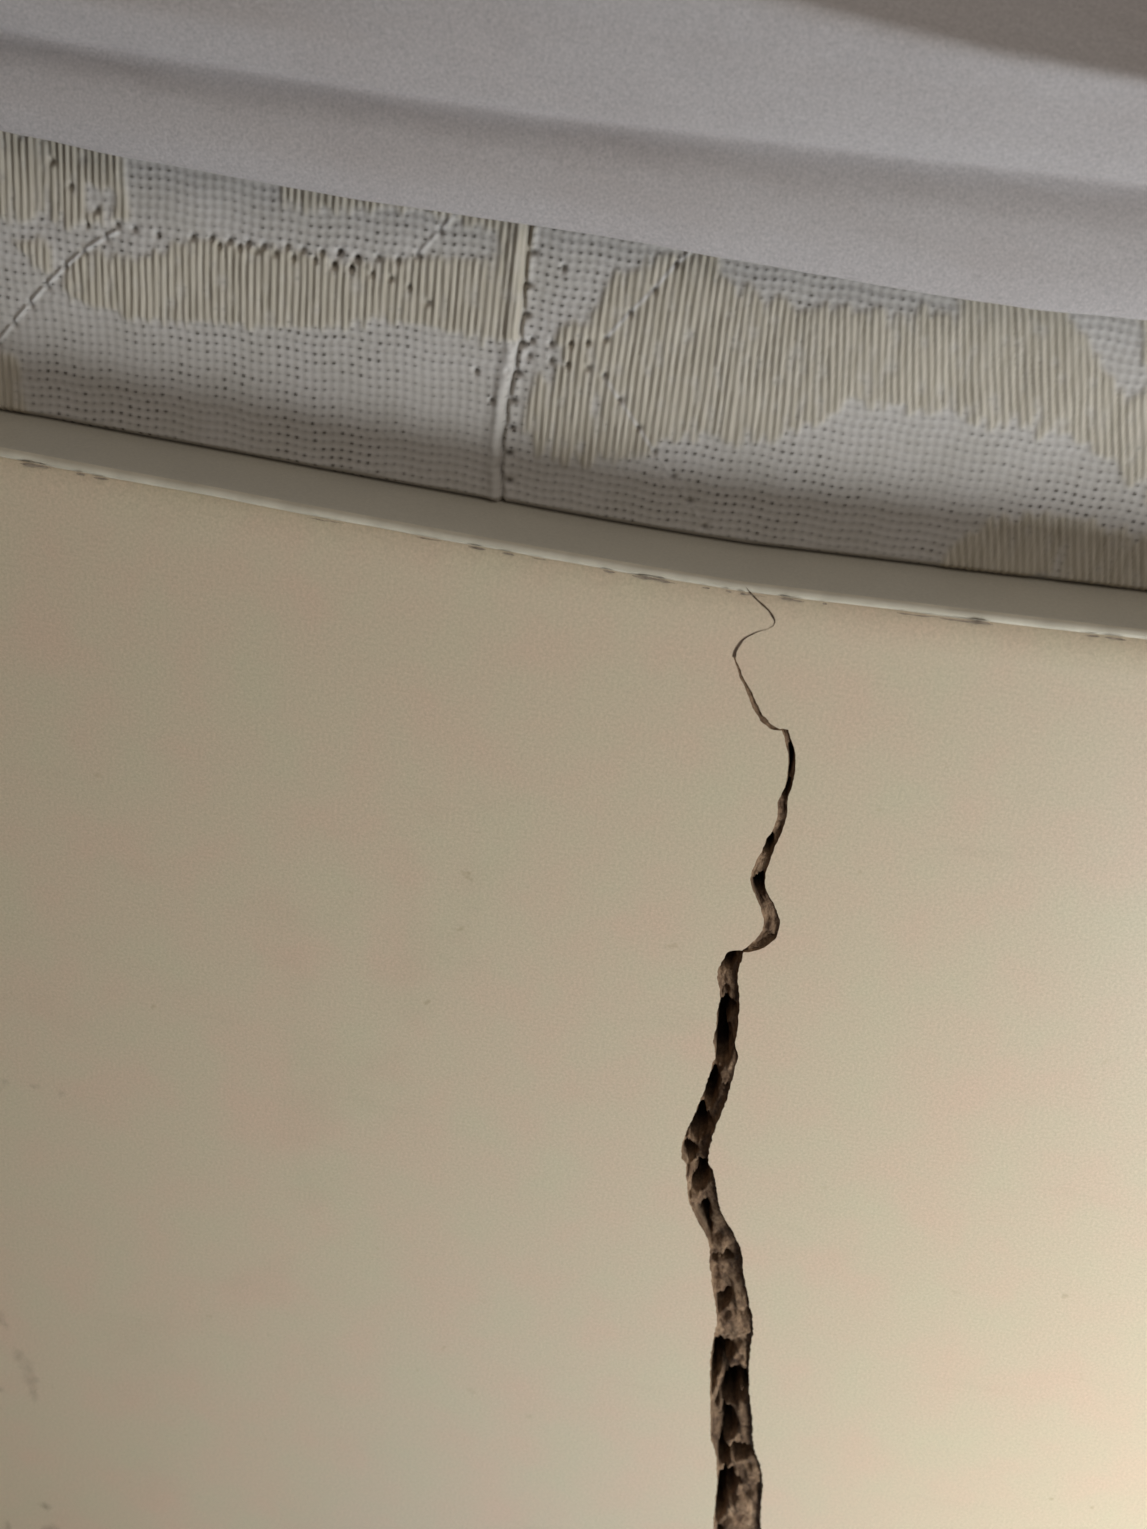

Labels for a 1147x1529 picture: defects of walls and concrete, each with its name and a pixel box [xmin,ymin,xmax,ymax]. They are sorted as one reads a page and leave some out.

crack [681,587,796,1529]